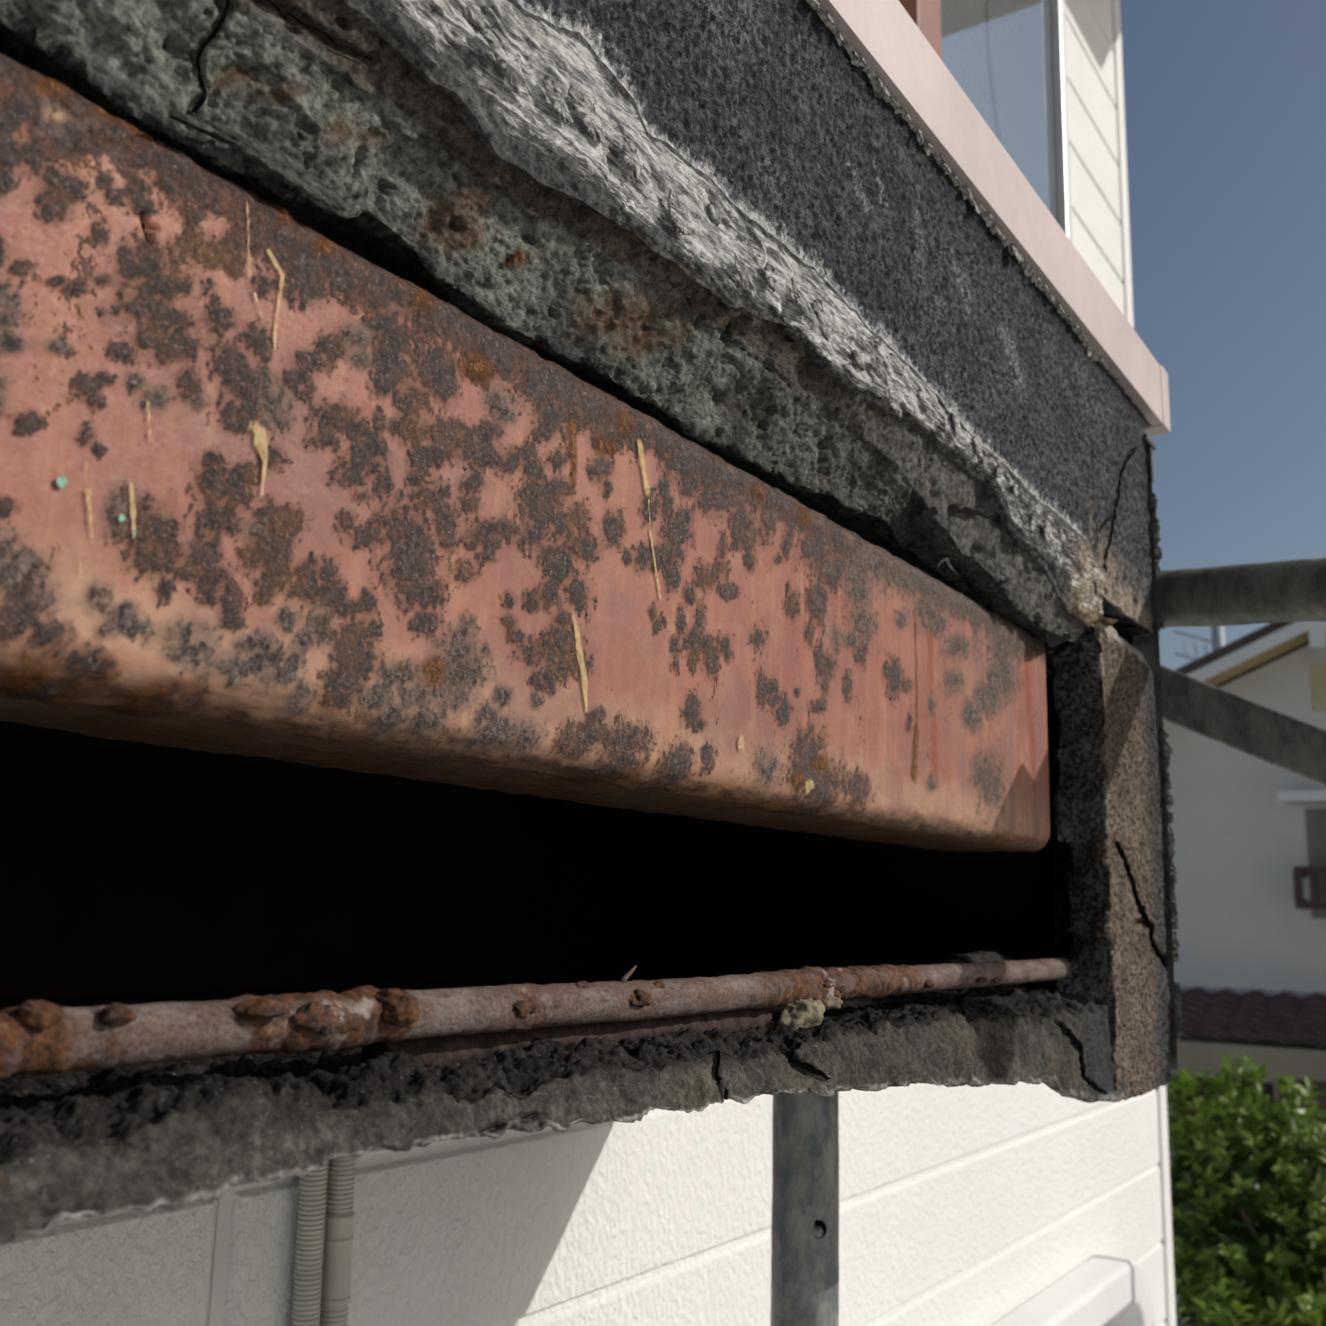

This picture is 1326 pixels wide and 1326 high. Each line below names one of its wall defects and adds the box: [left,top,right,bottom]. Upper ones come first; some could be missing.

crack [190,0,230,114]
crack [266,0,373,61]
corrosion [0,54,1045,826]
crack [1099,447,1136,645]
peeling [1146,457,1162,581]
peeling [1131,609,1184,1070]
crack [1115,841,1168,967]
crack [714,1050,728,1100]
crack [786,1045,831,1080]